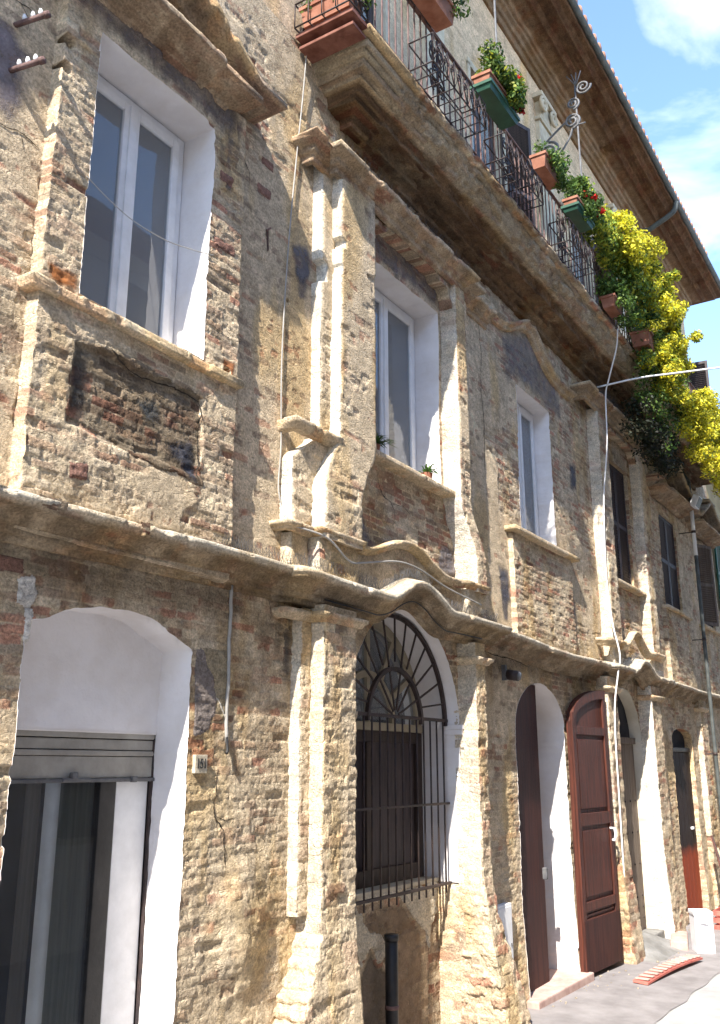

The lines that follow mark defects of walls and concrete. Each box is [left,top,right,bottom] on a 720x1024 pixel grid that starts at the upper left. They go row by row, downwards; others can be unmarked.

spalling [65,339,204,486]
crack [110,347,202,478]
crack [213,773,234,866]